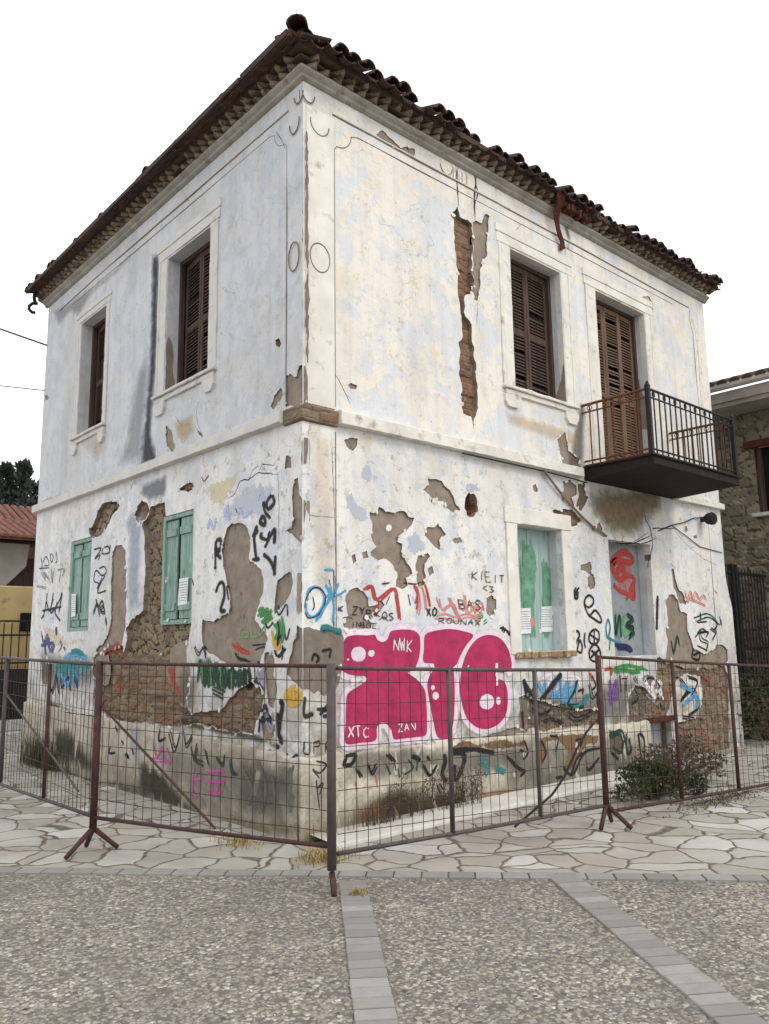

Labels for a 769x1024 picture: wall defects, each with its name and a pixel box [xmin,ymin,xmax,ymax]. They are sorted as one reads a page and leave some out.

flaking render [450,211,489,424]
damp [143,258,158,462]
peeling [402,524,441,582]
spalling [432,483,478,517]
flaking render [552,506,580,531]
flaking render [93,500,276,736]
damp [56,732,92,768]
damp [113,732,189,809]